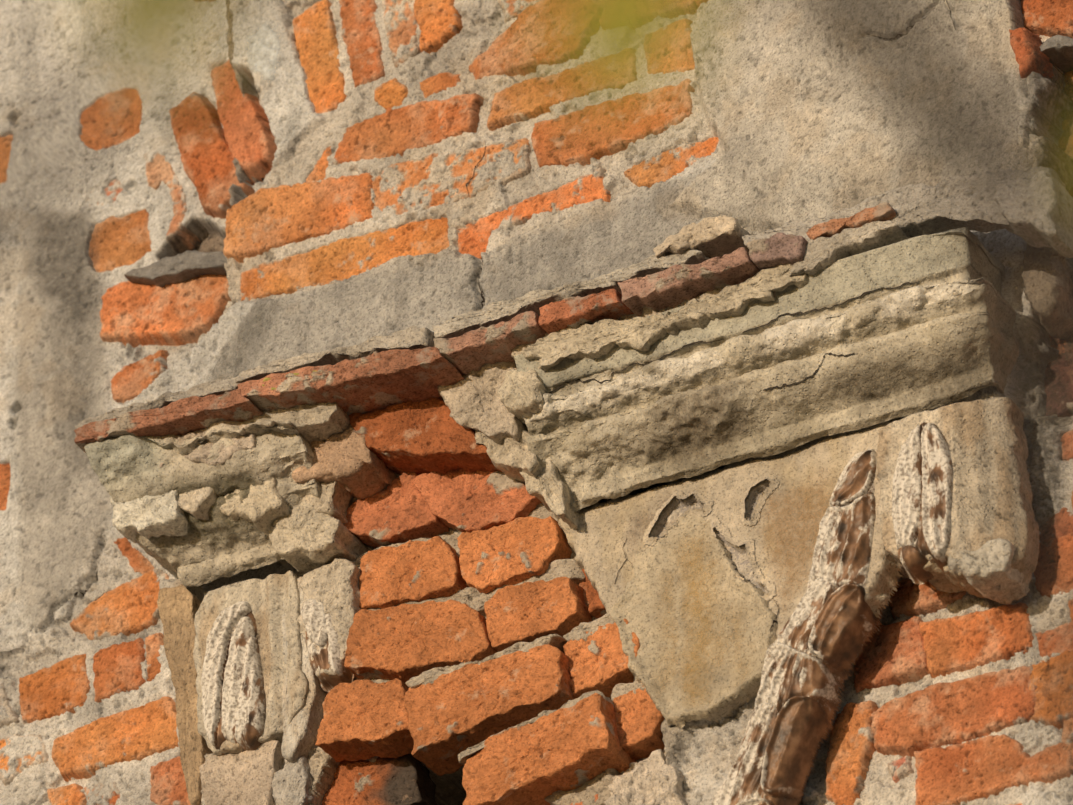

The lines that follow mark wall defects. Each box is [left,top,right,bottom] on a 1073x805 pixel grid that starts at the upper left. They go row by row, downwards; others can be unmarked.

spalling [79,0,725,411]
spalling [1026,65,1073,197]
spalling [0,463,11,511]
spalling [0,532,191,805]
spalling [308,398,779,805]
spalling [799,407,1073,805]